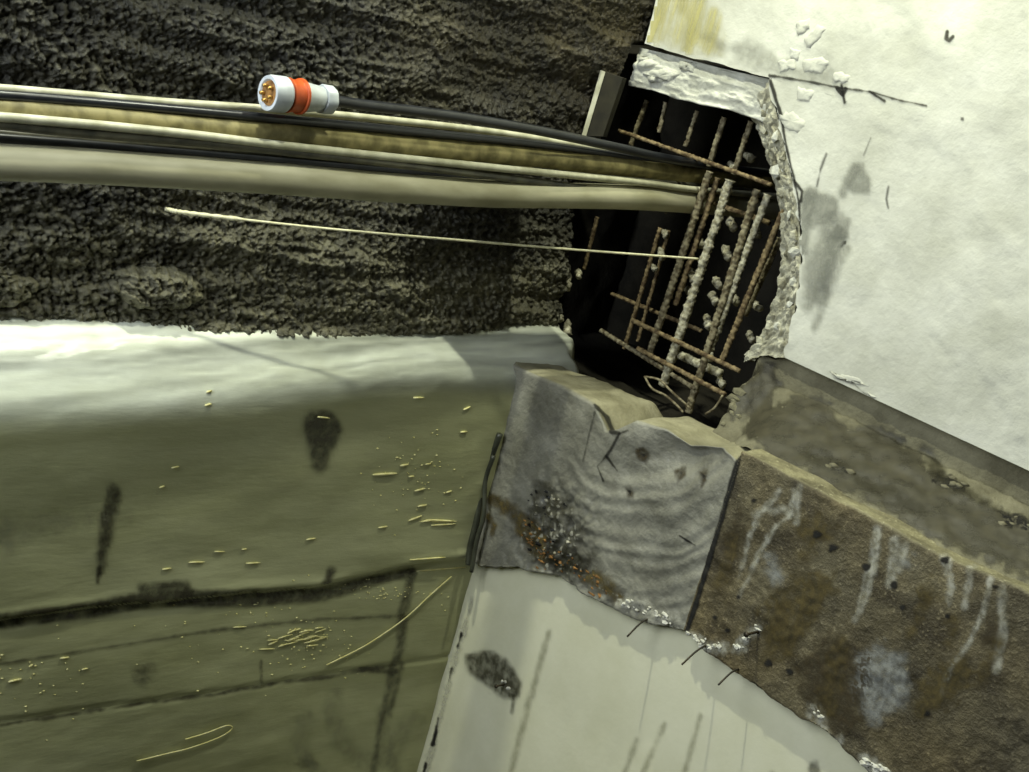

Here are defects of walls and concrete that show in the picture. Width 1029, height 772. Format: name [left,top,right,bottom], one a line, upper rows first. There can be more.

crack [768,74,927,223]
spalling [567,216,599,292]
spalling [599,48,815,426]
leakage [799,166,869,308]
leakage [305,412,341,469]
leakage [97,488,120,583]
corrosion [486,495,623,600]